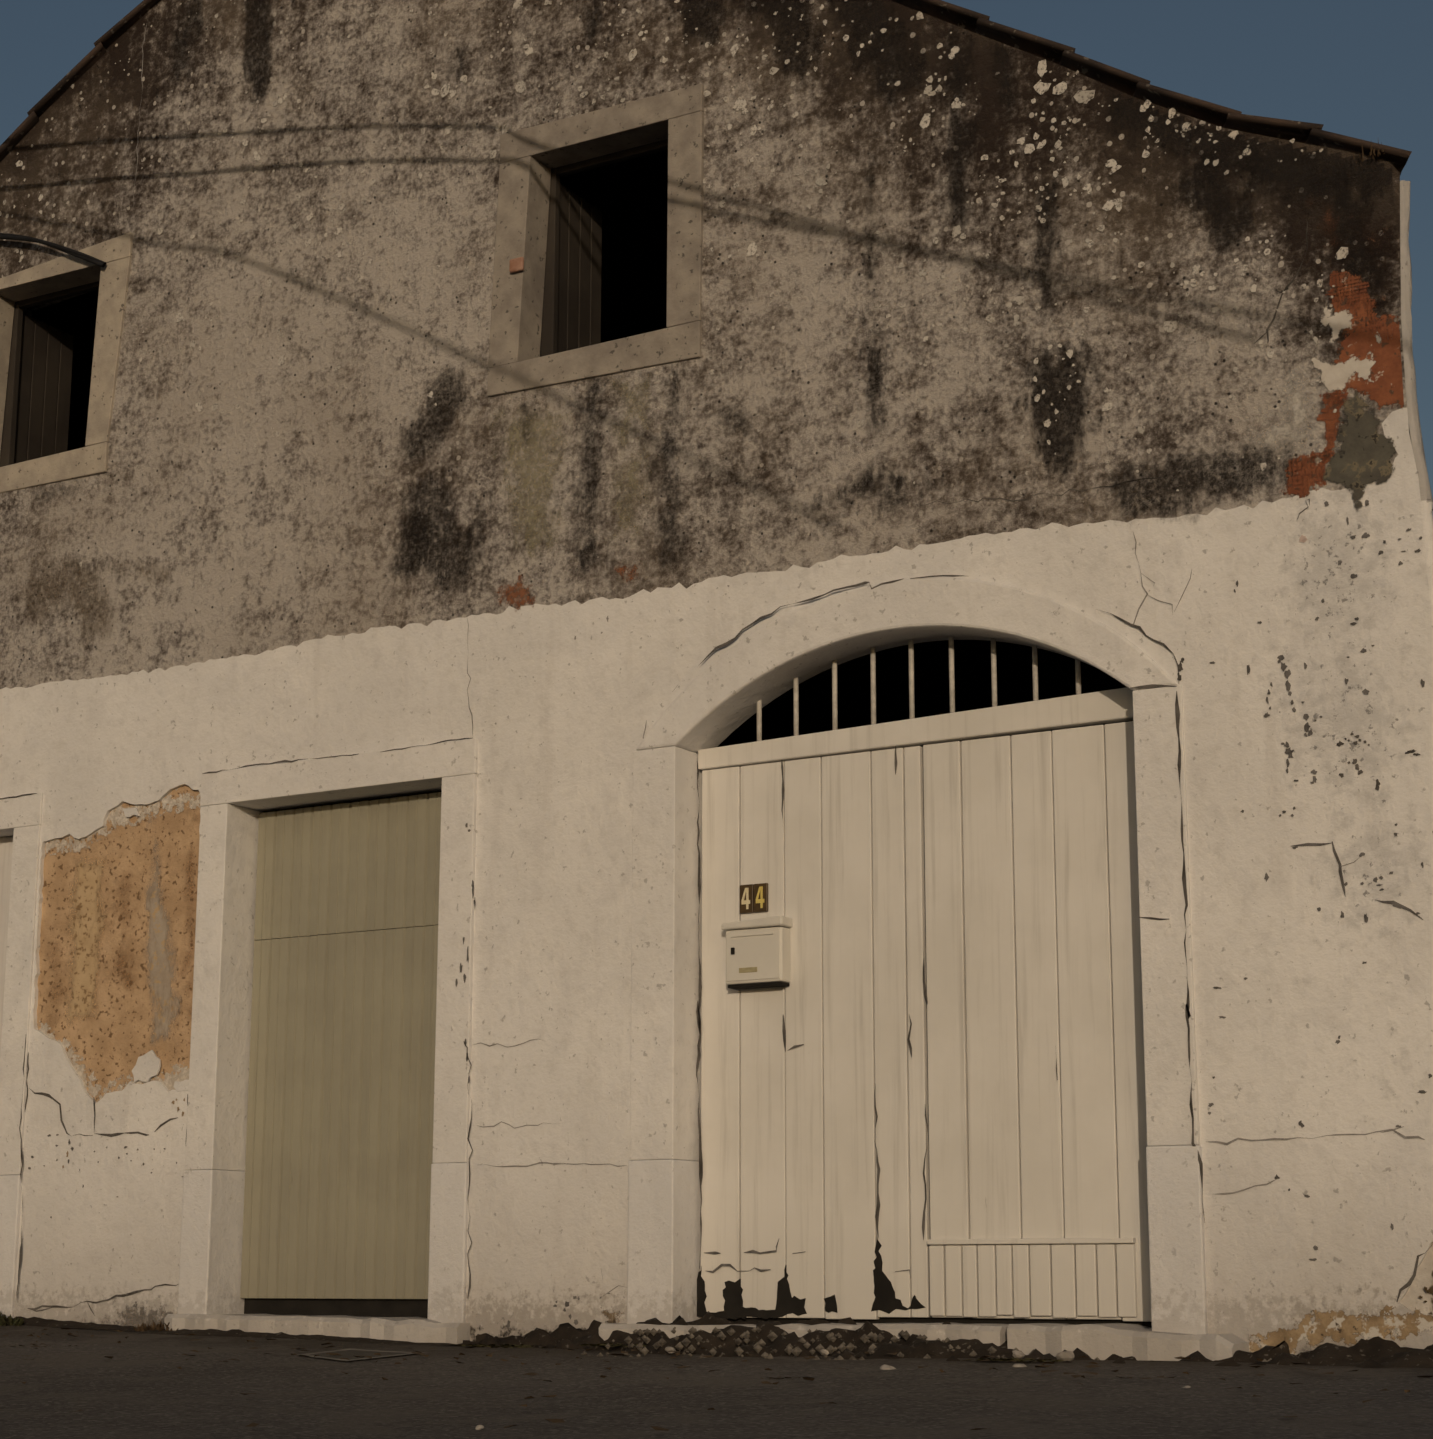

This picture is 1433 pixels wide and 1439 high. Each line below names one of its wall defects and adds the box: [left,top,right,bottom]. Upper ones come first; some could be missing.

leakage [748,0,822,78]
leakage [828,0,926,104]
leakage [1110,94,1395,308]
leakage [1016,342,1102,474]
peeling [1258,271,1404,506]
leakage [1112,446,1297,517]
peeling [1346,517,1422,565]
crack [672,575,964,692]
crack [1103,532,1425,1223]
peeling [36,785,201,1116]
crack [16,1038,188,1316]
peeling [1249,1242,1433,1354]